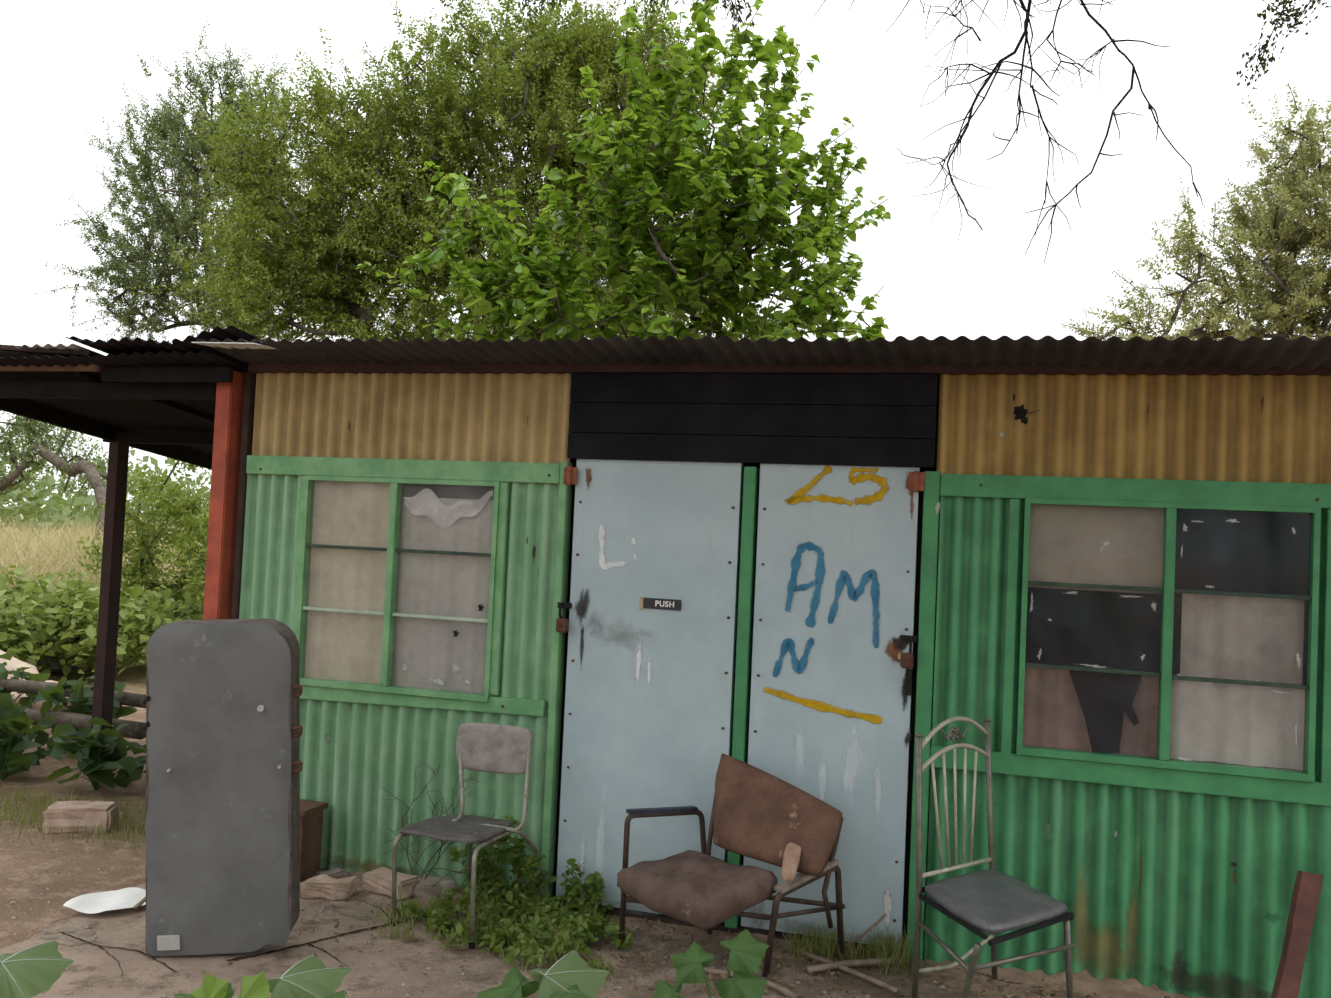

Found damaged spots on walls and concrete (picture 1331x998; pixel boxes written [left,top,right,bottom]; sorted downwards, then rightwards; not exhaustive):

rust [886,637,909,708]